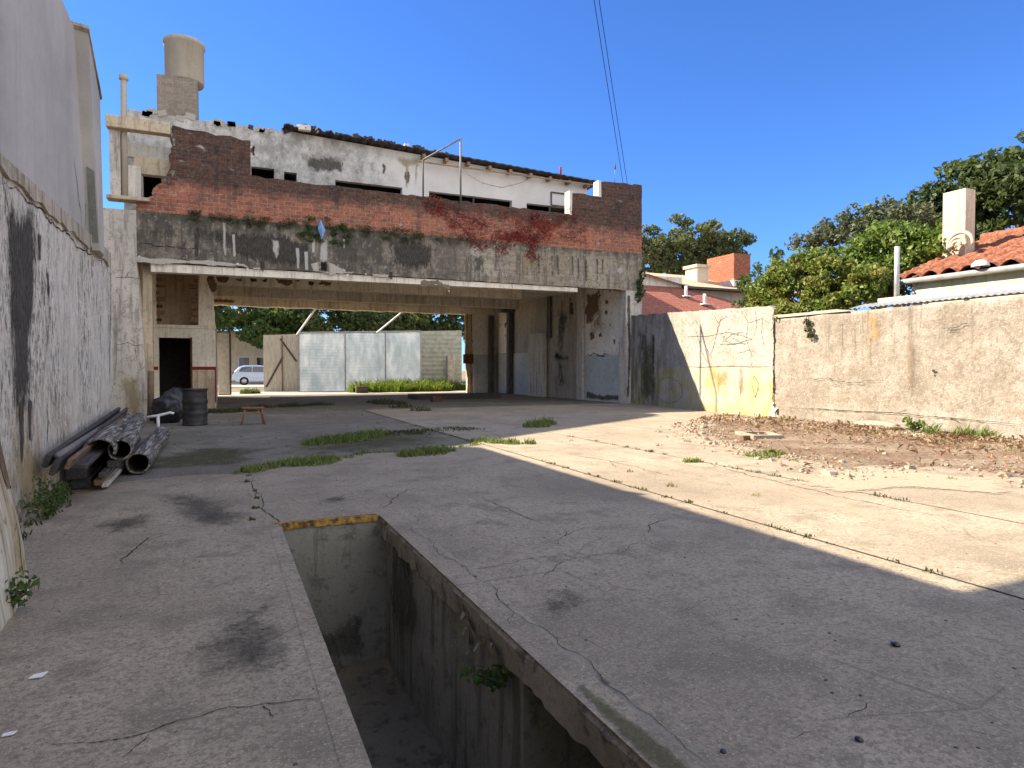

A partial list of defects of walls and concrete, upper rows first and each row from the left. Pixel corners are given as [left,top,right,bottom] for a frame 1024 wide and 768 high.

crack [3,160,138,279]
damp [390,238,431,279]
damp [9,208,42,494]
peeling [569,290,615,345]
damp [587,295,655,400]
crack [383,488,710,766]
crack [53,695,328,758]